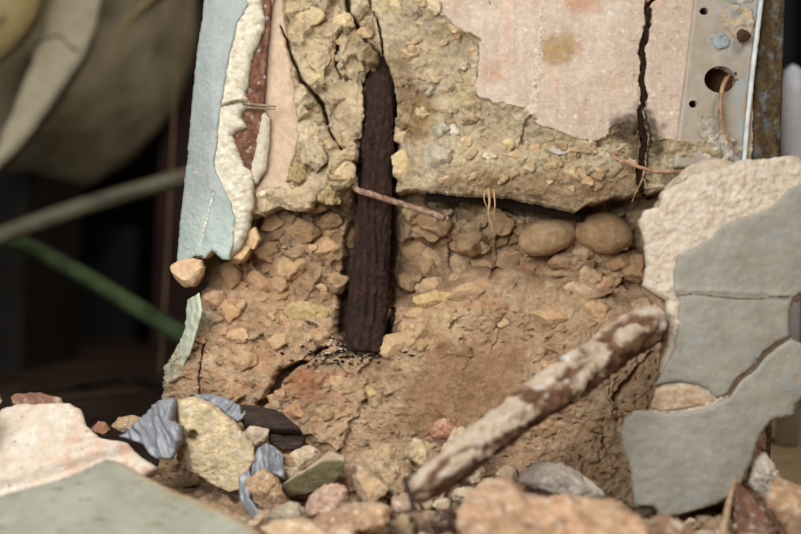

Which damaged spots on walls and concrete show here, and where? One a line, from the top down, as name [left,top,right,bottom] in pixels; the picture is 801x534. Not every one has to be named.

crack [280,26,342,150]
crack [334,0,388,77]
crack [637,0,655,197]
spalling [161,0,755,464]
spalling [156,453,215,487]
spalling [483,342,715,503]
spalling [707,471,766,508]
spalling [753,430,766,460]